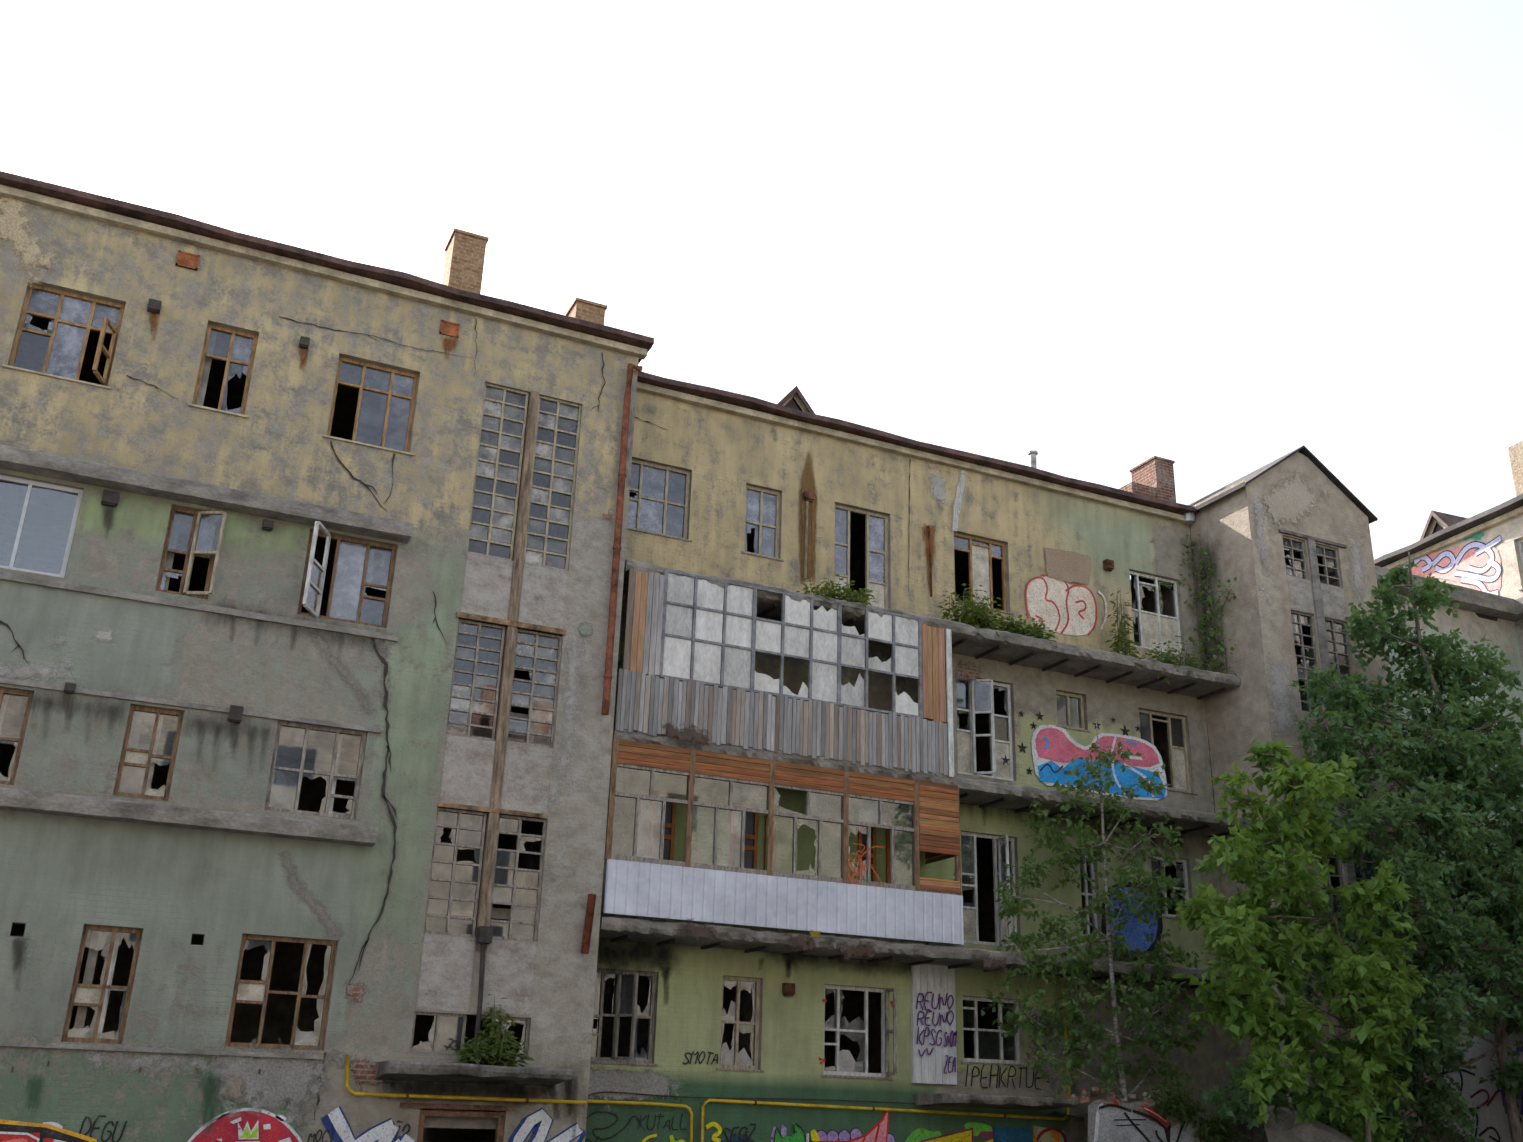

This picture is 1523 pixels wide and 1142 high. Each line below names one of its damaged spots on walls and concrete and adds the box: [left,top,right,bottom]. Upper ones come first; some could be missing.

crack [330,440,395,511]
crack [0,620,29,665]
crack [282,637,397,983]